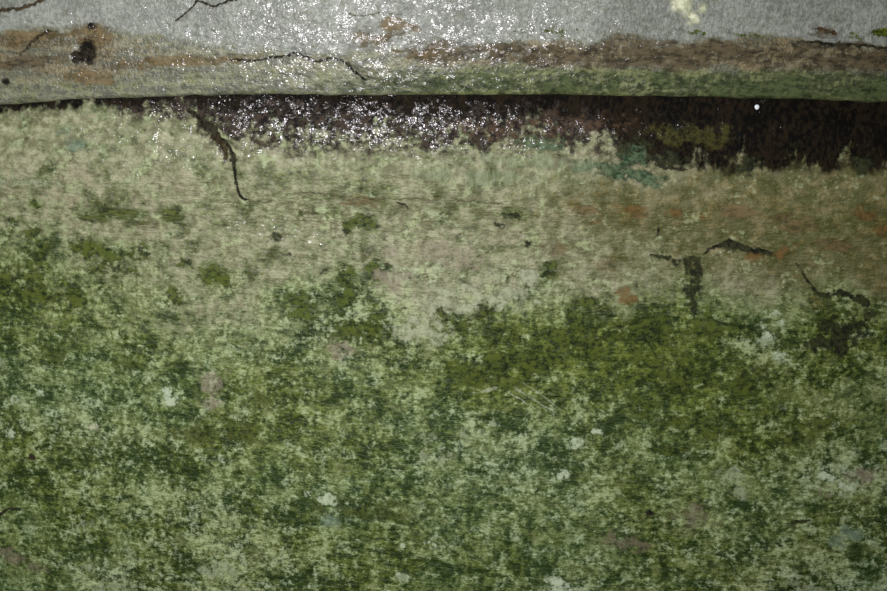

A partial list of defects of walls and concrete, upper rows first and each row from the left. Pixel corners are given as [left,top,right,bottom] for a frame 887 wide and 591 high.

crack [0,0,44,12]
crack [175,0,237,21]
crack [228,52,396,85]
corrosion [355,17,420,48]
corrosion [395,27,887,75]
leakage [0,97,174,113]
leakage [186,71,887,176]
crack [188,110,501,209]
crack [649,227,775,266]
crack [795,263,870,310]